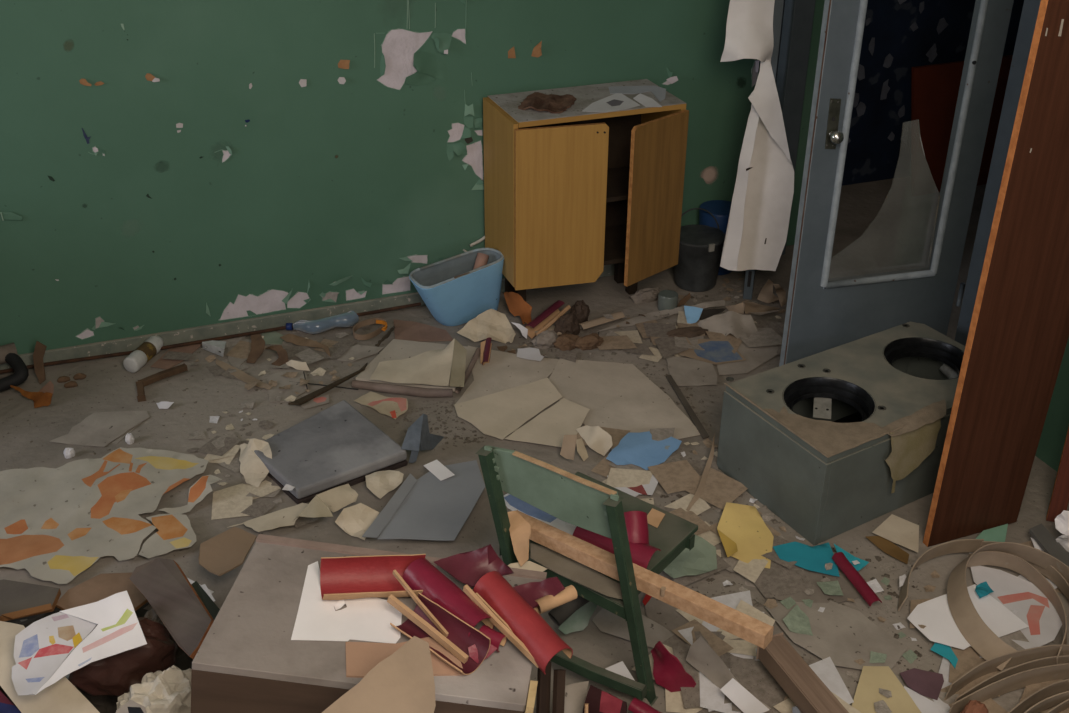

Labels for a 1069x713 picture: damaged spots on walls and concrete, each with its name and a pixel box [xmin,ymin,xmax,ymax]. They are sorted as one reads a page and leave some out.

peeling [374,28,466,91]
peeling [216,146,232,163]
peeling [446,104,484,190]
peeling [206,255,443,321]